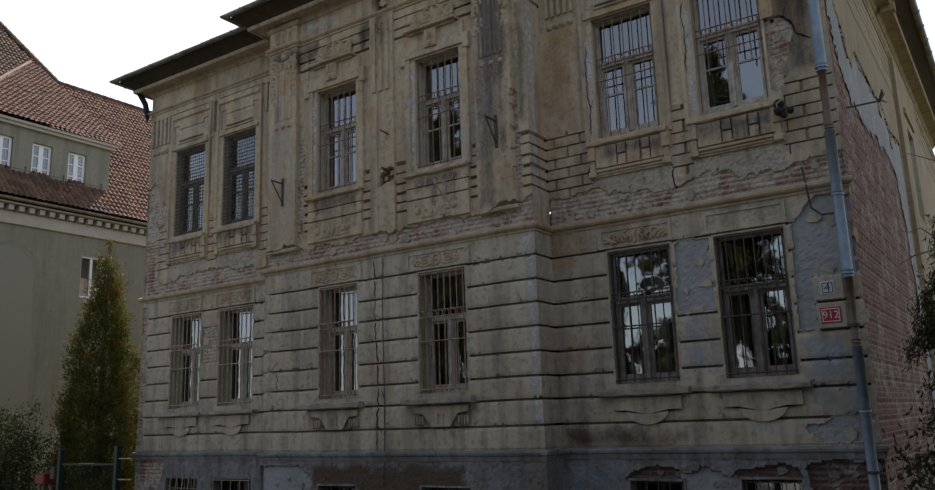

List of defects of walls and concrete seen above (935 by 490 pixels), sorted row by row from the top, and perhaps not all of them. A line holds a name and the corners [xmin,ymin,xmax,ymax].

flaking render [824,0,935,490]
flaking render [135,460,164,490]
peeling [263,466,312,490]
flaking render [628,459,870,490]